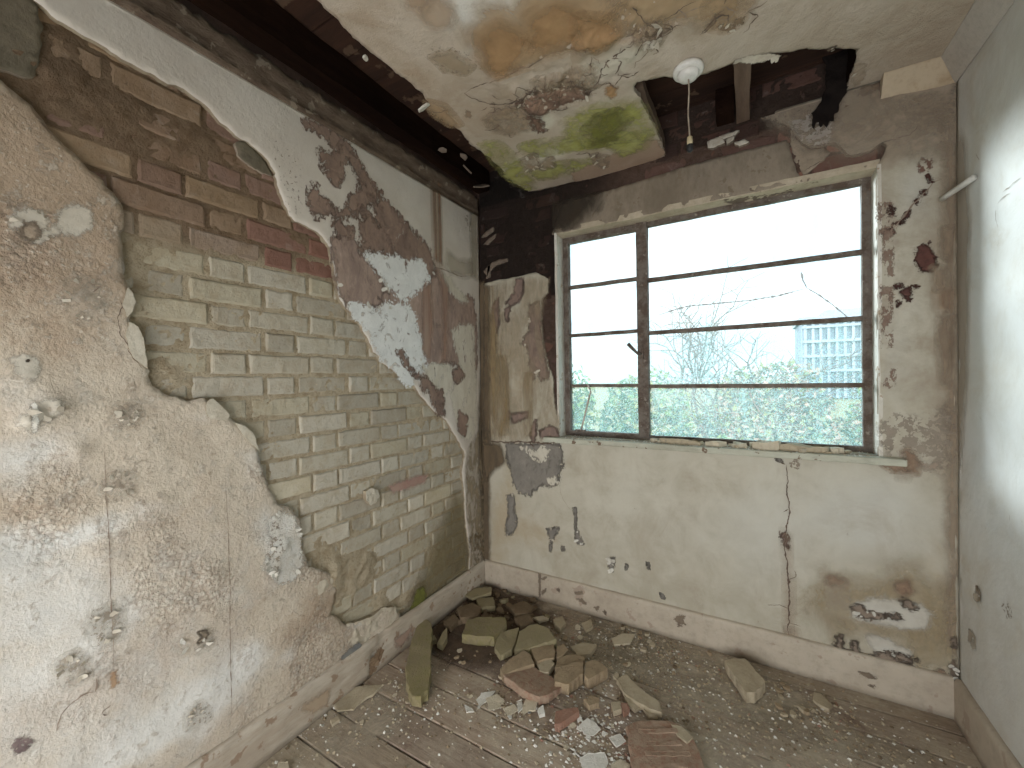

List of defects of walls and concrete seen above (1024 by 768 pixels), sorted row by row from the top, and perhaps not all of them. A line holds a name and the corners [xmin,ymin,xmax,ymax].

spalling [0,0,479,648]
leakage [428,104,472,126]
leakage [473,0,740,76]
crack [467,0,767,174]
spalling [479,45,885,410]
peeling [875,200,940,348]
peeling [916,157,935,184]
peeling [503,409,565,536]
peeling [545,507,585,552]
crack [774,463,798,635]
peeling [833,633,921,666]
peeling [848,596,921,622]